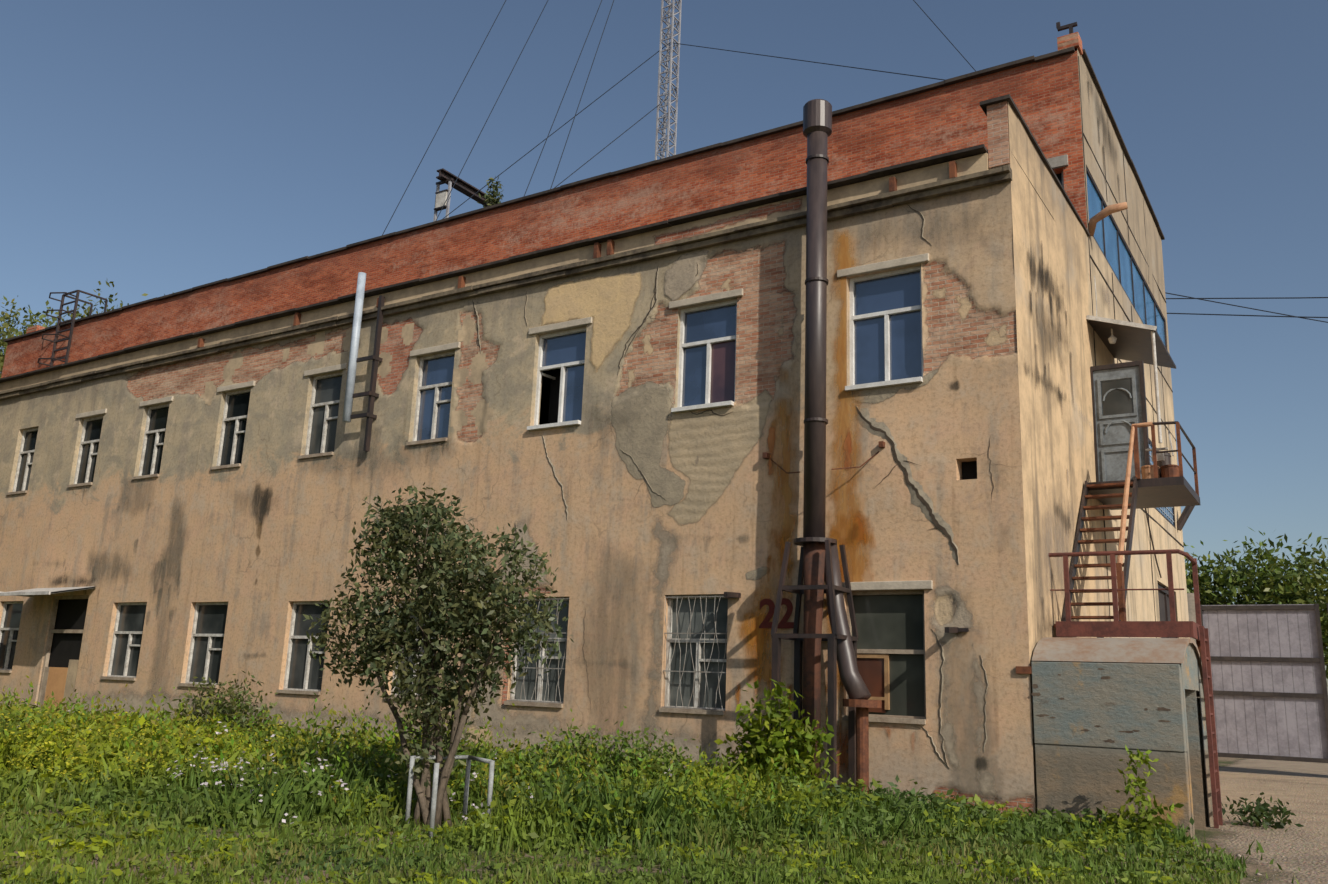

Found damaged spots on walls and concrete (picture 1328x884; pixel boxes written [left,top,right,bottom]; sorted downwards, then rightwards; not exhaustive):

flaking render [127,327,352,406]
flaking render [377,318,423,395]
flaking render [450,311,500,442]
flaking render [616,241,797,404]
corrosion [831,233,871,582]
flaking render [923,261,1017,373]
water stain [1030,247,1067,338]
water stain [254,488,271,552]
crack [542,435,570,520]
corrosion [741,405,795,685]
crack [855,406,959,564]